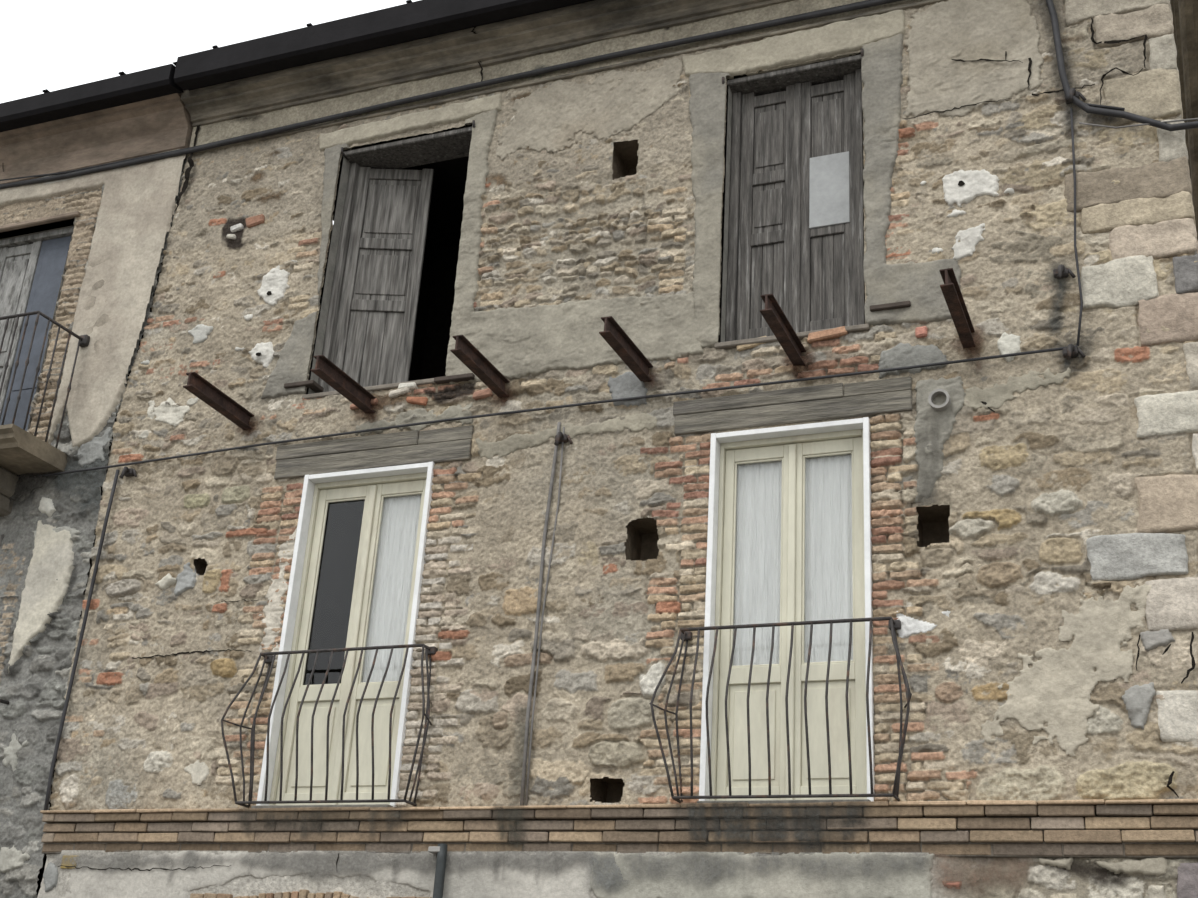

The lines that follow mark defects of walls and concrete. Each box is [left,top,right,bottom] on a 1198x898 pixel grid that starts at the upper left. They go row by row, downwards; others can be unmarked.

crack [903,18,1148,119]
crack [175,125,200,211]
spalling [69,427,113,467]
spalling [2,729,29,773]
spalling [0,845,31,873]